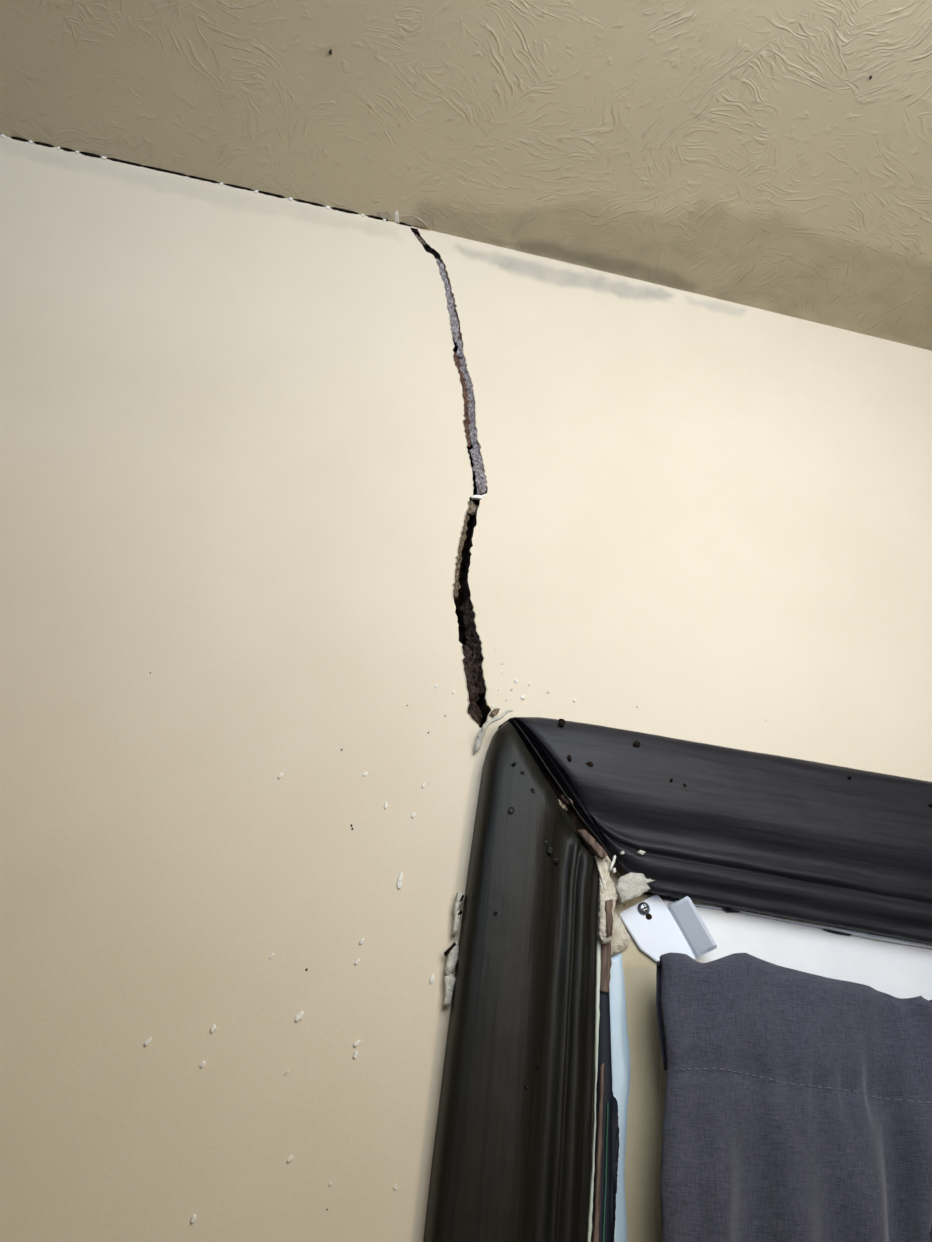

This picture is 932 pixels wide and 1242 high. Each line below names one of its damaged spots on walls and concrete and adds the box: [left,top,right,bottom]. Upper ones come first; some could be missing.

crack [0,134,613,861]